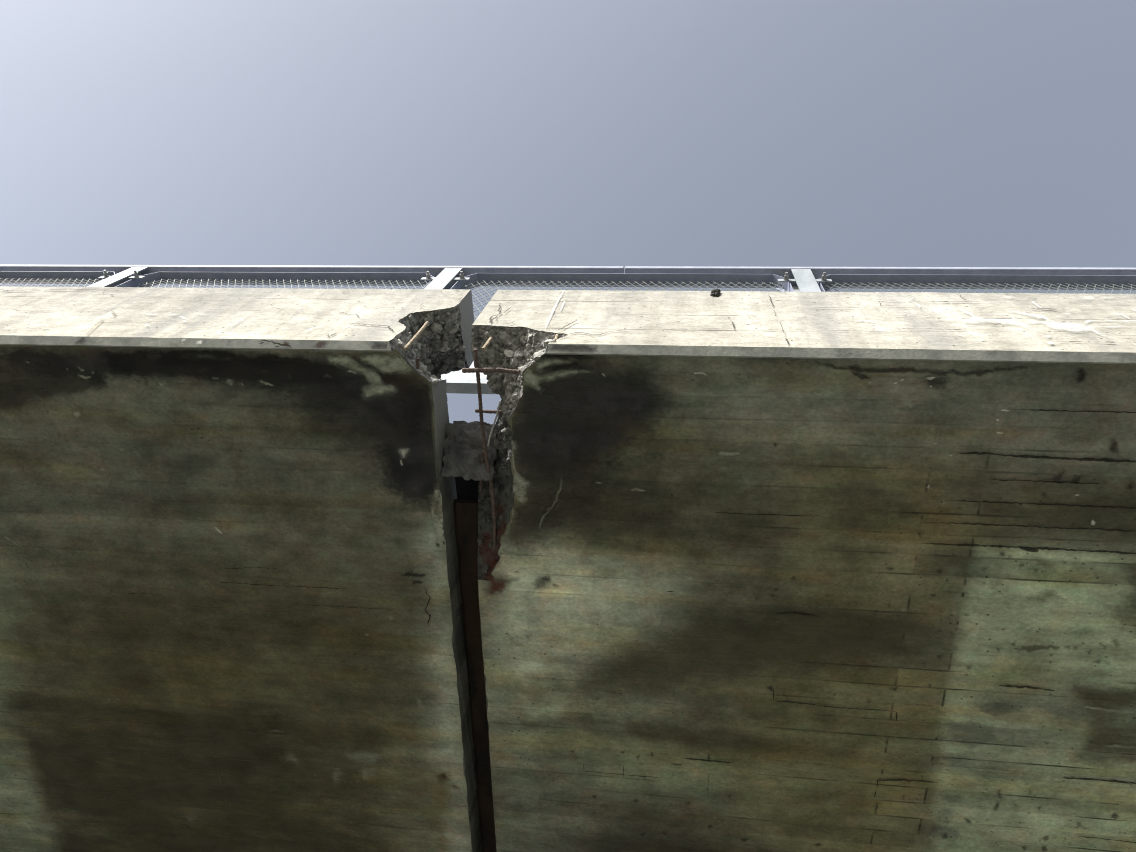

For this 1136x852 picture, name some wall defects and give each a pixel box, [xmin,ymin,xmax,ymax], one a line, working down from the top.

leakage [0,337,437,499]
spalling [389,290,567,580]
leakage [512,344,663,529]
leakage [828,364,1027,387]
crack [923,452,1136,555]
crack [1018,407,1136,415]